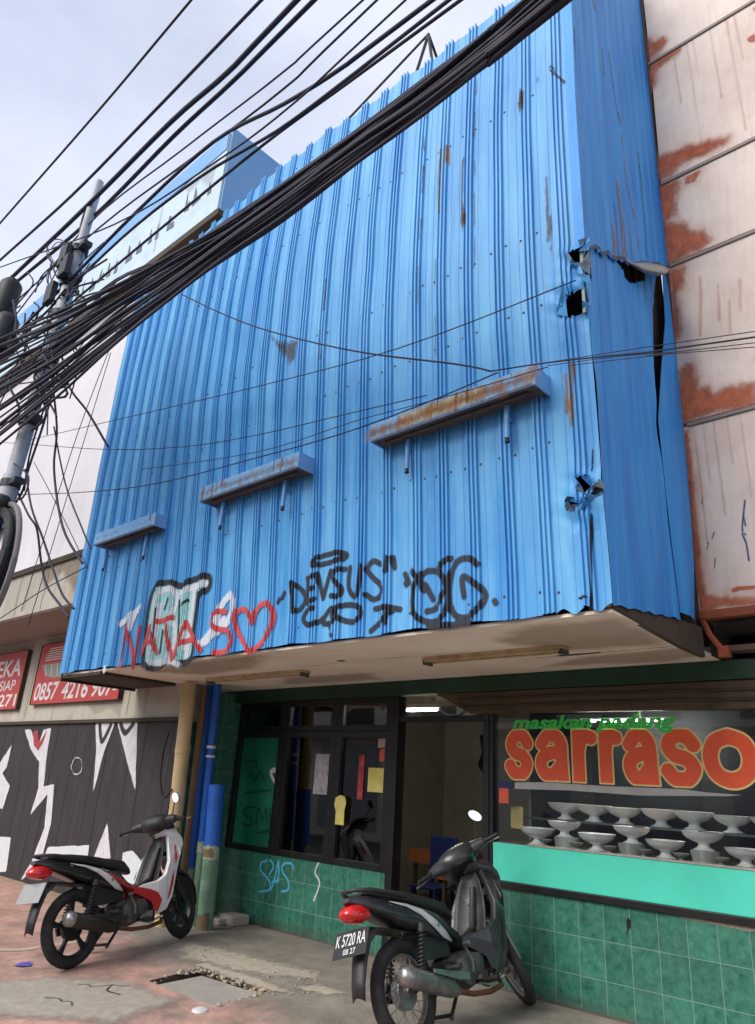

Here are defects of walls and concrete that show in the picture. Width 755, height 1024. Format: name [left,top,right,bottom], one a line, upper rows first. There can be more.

rust [647,38,681,85]
rust [439,145,450,189]
rust [582,138,727,338]
peeling [556,279,569,317]
peeling [567,238,592,314]
rust [370,367,536,441]
rust [565,363,575,424]
rust [199,456,296,501]
peeling [564,477,605,511]
rust [680,364,755,610]
peeling [187,841,219,880]
spalling [150,913,345,995]